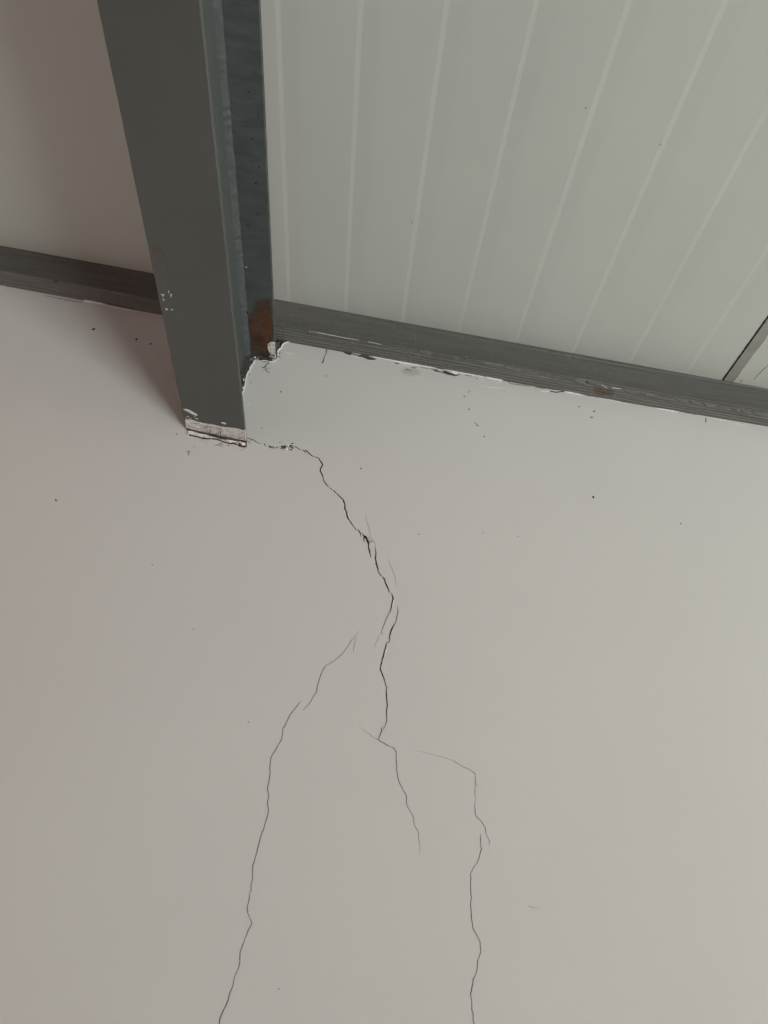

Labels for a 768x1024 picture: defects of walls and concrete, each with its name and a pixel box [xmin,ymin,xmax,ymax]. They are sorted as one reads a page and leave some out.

rust [249,300,273,358]
crack [219,447,490,1024]